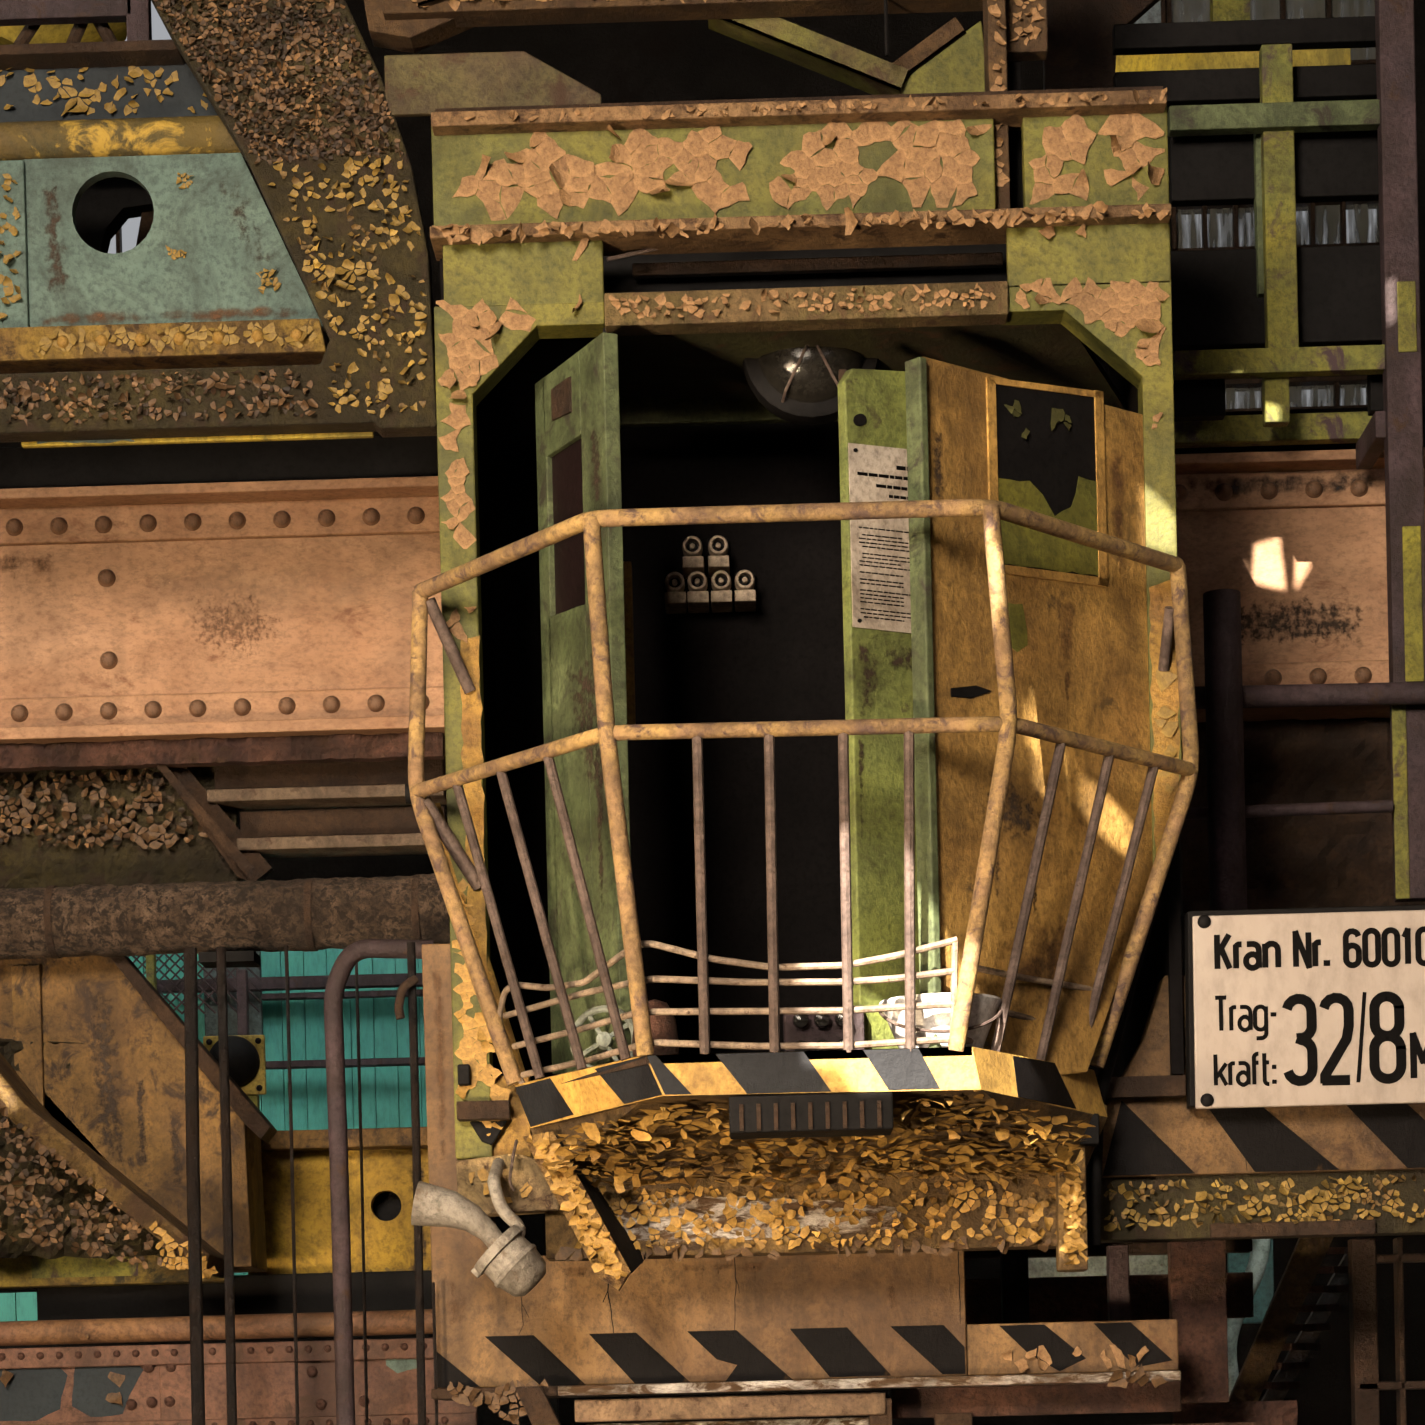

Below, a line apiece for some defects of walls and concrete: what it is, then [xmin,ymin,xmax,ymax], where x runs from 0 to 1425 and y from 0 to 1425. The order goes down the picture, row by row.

peeling [0,0,1169,549]
peeling [0,1366,143,1422]